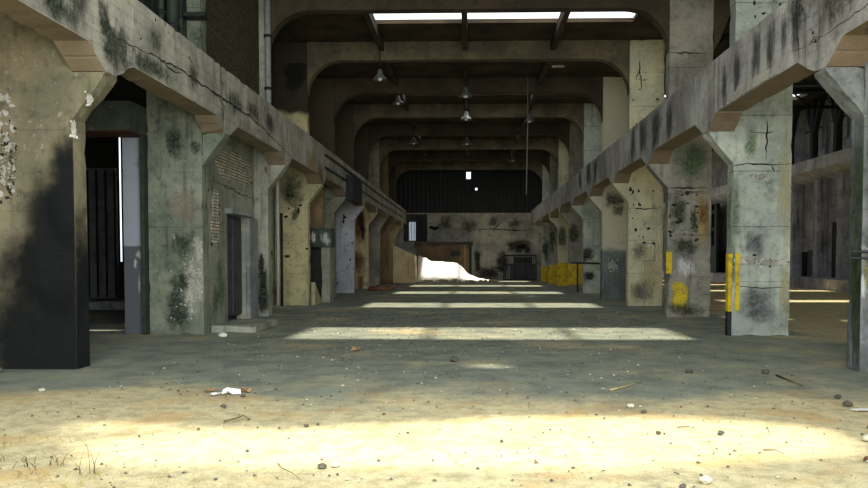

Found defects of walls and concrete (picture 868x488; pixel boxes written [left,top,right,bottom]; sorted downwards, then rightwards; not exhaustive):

water stain [99,1,168,84]
crack [782,0,868,55]
crack [115,36,290,155]
flaking render [0,93,18,204]
crack [735,122,792,172]
mould [168,270,198,326]